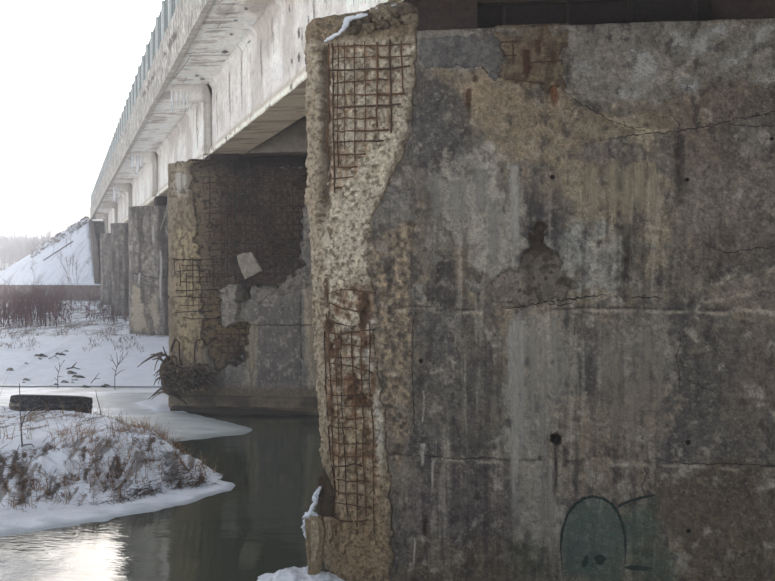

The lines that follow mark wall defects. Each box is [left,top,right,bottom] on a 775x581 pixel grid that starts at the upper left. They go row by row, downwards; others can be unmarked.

crack [562,88,775,144]
water stain [509,164,520,246]
spalling [172,7,579,581]
crack [502,294,609,316]
water stain [508,317,525,511]